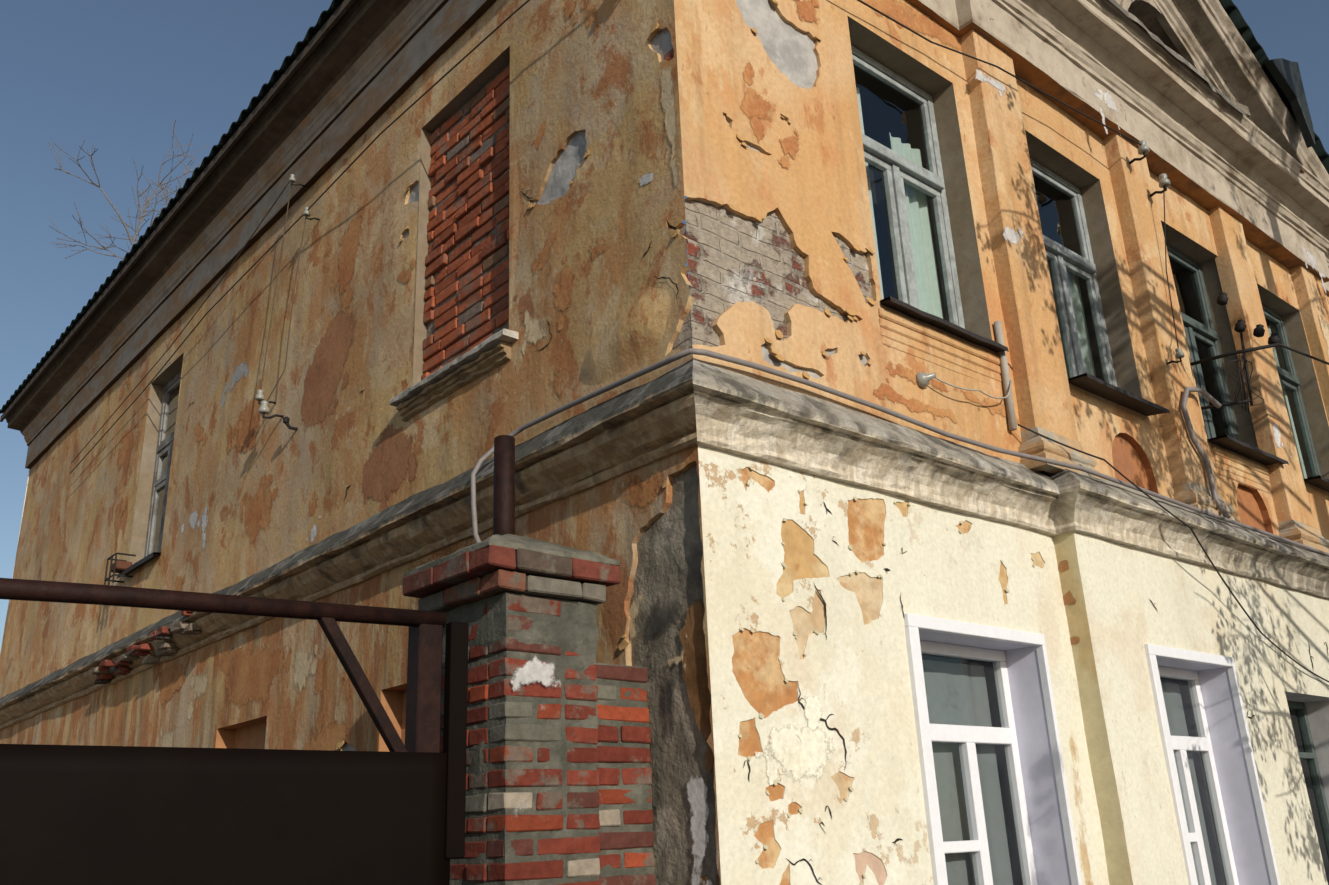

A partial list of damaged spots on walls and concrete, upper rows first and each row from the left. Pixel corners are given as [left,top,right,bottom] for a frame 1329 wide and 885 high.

flaking render [736,0,821,89]
peeling [861,0,961,50]
peeling [723,63,799,169]
flaking render [671,200,875,379]
peeling [858,351,1019,424]
peeling [741,466,774,492]
flaking render [608,464,720,885]
peeling [732,490,911,817]
peeling [293,711,355,751]
crack [795,683,847,767]
peeling [754,820,790,885]
peeling [854,851,886,885]